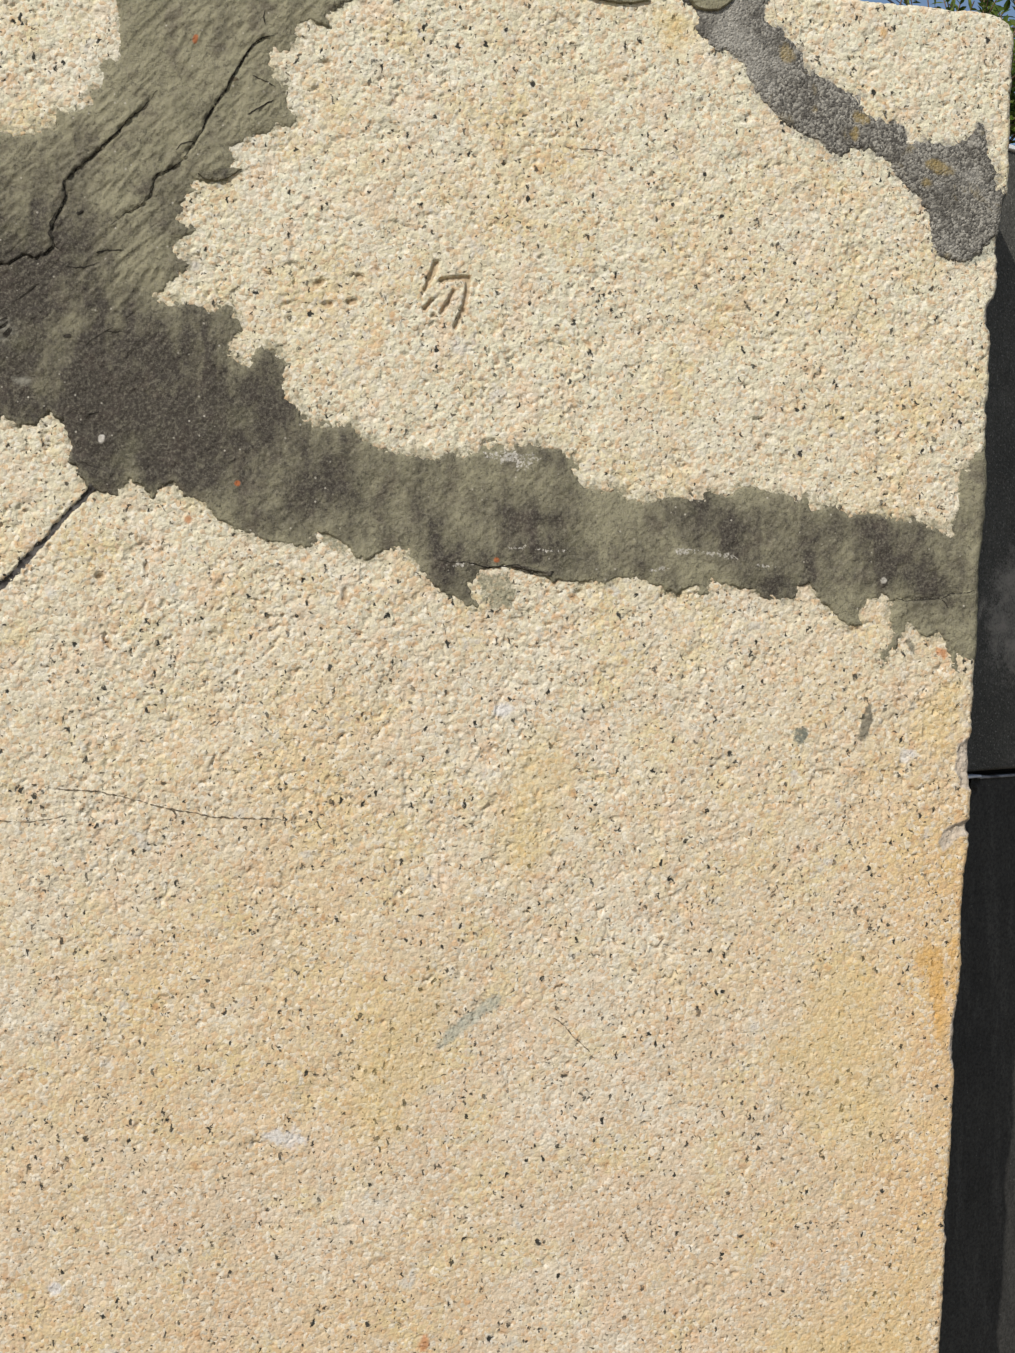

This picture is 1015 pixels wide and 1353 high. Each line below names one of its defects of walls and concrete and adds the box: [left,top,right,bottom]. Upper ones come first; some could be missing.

leakage [633,0,712,90]
leakage [846,106,876,145]
crack [0,11,274,328]
leakage [0,294,41,394]
leakage [96,433,107,445]
leakage [476,443,553,479]
crack [0,462,96,590]
leakage [430,557,486,571]
leakage [645,543,783,578]
leakage [878,575,890,586]